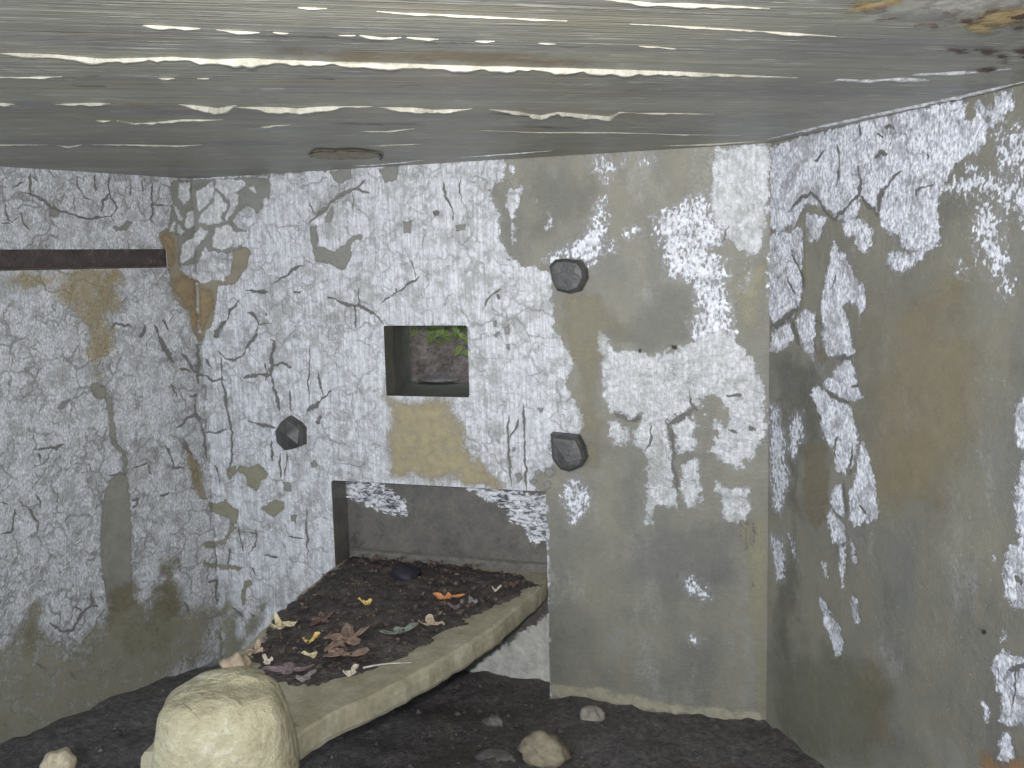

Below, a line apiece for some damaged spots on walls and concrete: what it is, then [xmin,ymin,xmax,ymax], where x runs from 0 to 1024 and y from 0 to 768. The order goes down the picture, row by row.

spalling [915,0,1024,35]
spalling [948,48,1024,73]
crack [1,172,164,230]
rust [0,234,175,271]
rust [174,275,214,330]
crack [327,261,420,328]
crack [109,264,332,509]
peeling [159,90,1024,699]
crack [506,404,528,491]
crack [208,509,309,618]
damp [218,602,264,657]
peeling [981,630,1024,763]